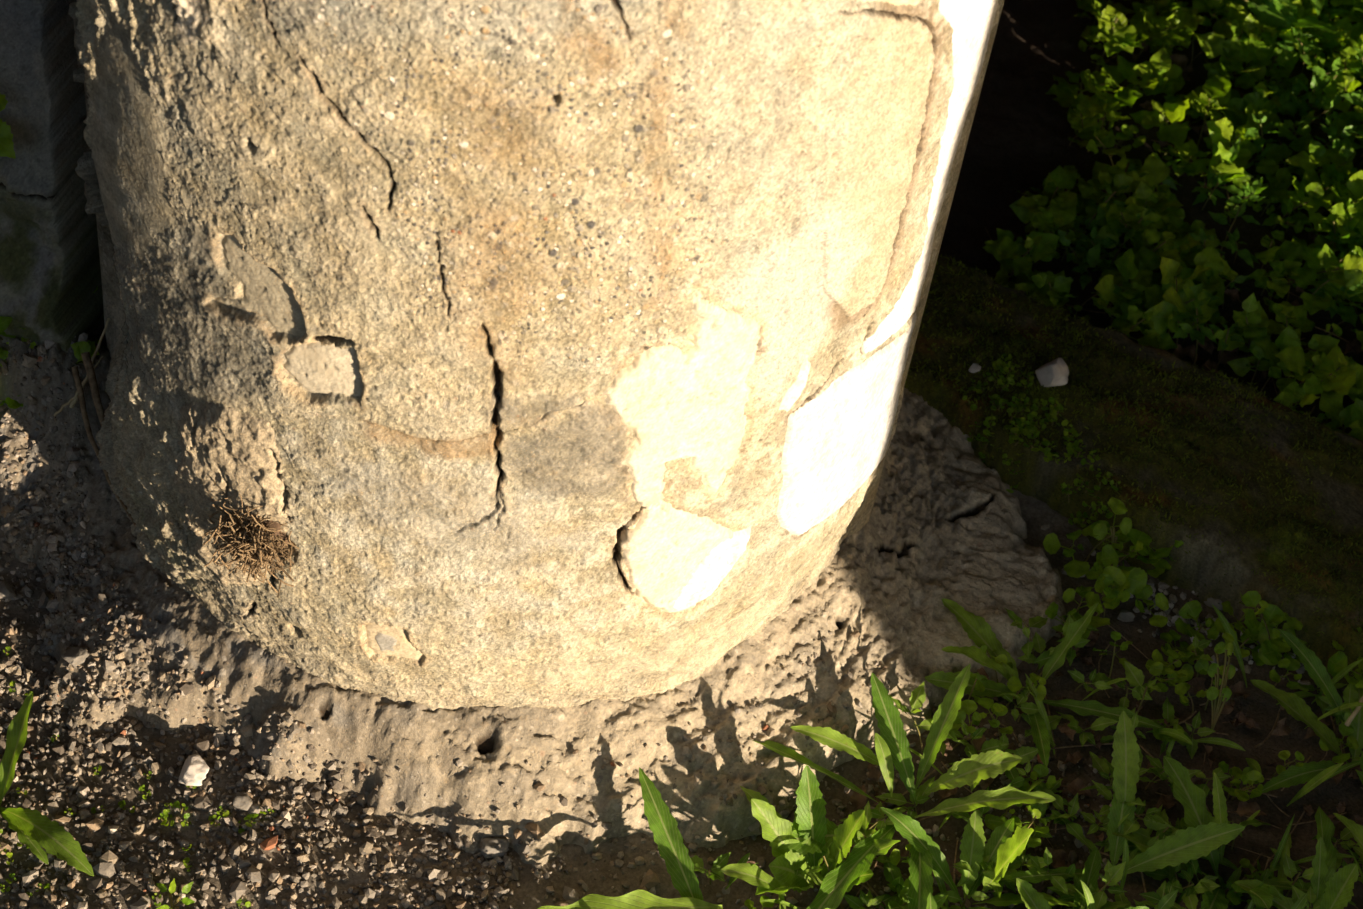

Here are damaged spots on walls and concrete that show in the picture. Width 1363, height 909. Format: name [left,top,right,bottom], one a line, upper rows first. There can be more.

crack [263,0,279,42]
crack [612,0,631,38]
crack [313,76,396,237]
spalling [214,234,363,396]
crack [436,240,450,315]
flaking render [776,0,999,536]
crack [461,323,505,529]
flaking render [602,291,760,613]